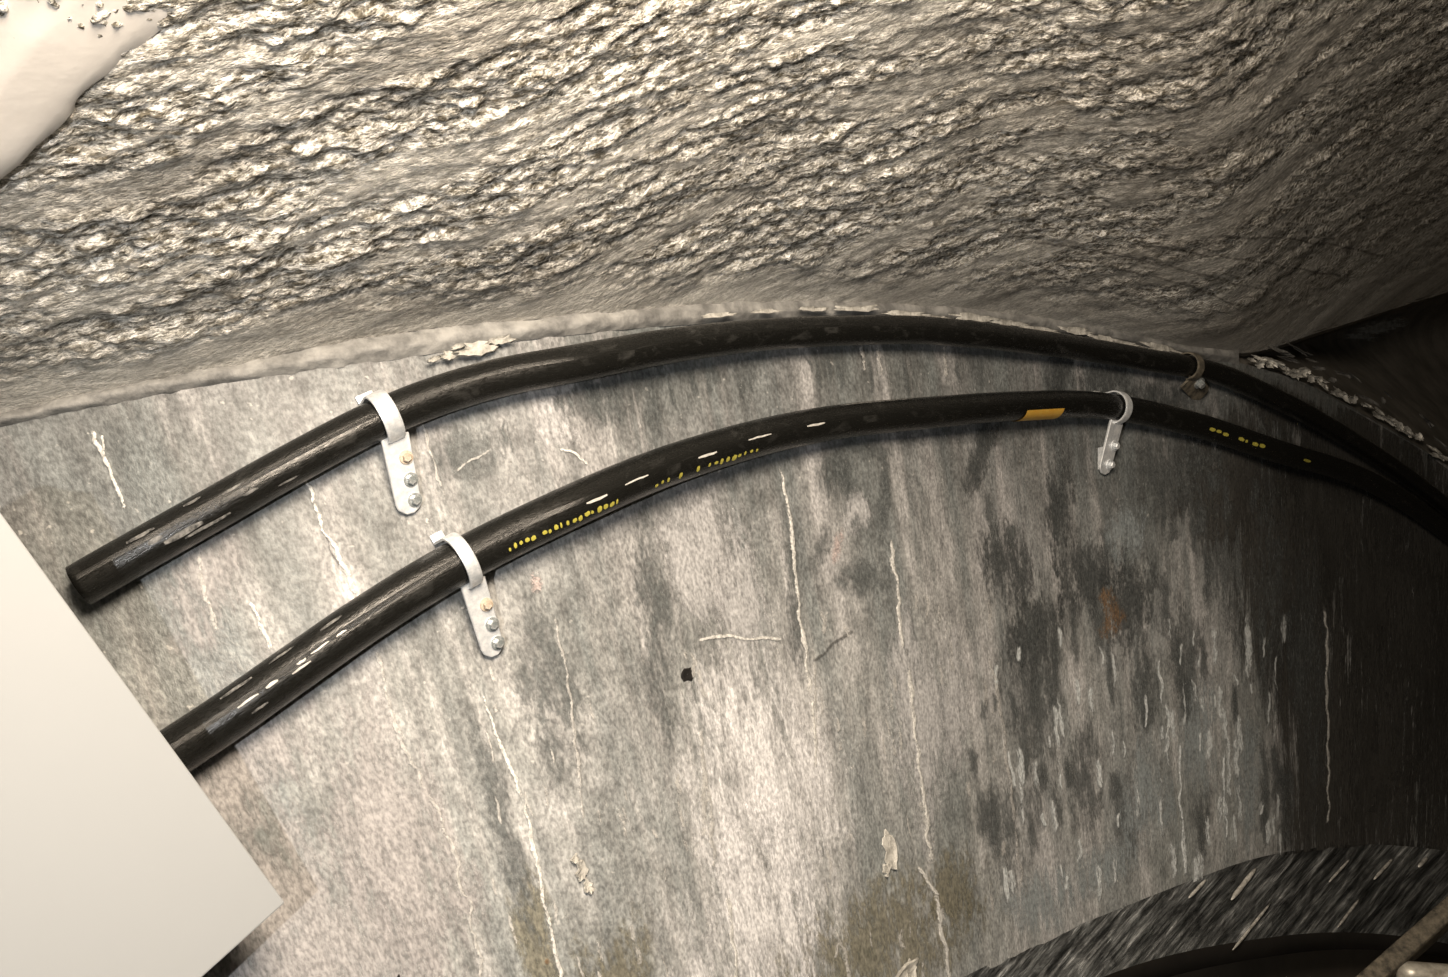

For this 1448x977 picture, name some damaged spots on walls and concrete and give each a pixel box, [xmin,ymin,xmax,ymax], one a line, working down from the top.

leakage [1224,385,1448,521]
leakage [471,575,668,977]
leakage [635,422,1448,977]